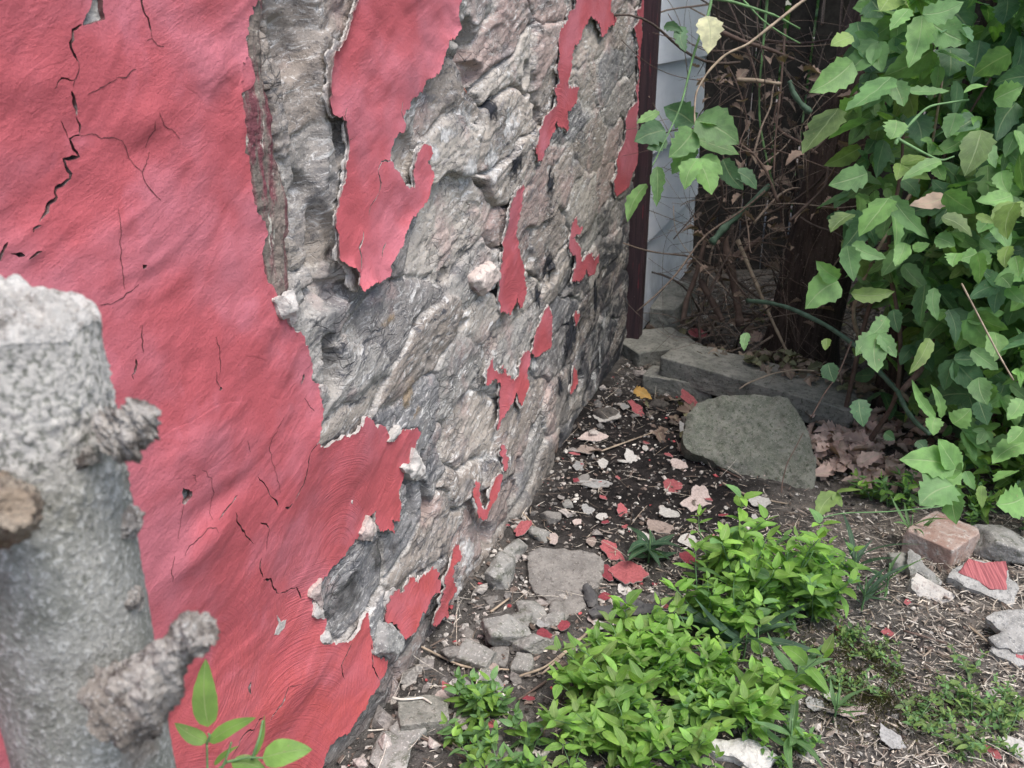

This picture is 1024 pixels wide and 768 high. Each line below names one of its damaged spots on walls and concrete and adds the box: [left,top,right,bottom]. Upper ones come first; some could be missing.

crack [60,66,136,104]
peeling [533,0,617,163]
crack [33,115,180,228]
peeling [321,0,462,292]
crack [103,208,139,305]
peeling [496,185,527,316]
peeling [482,304,553,431]
crack [171,470,219,580]
peeling [383,543,462,641]
peeling [472,444,509,521]
peeling [577,399,644,488]
peeling [599,540,649,596]